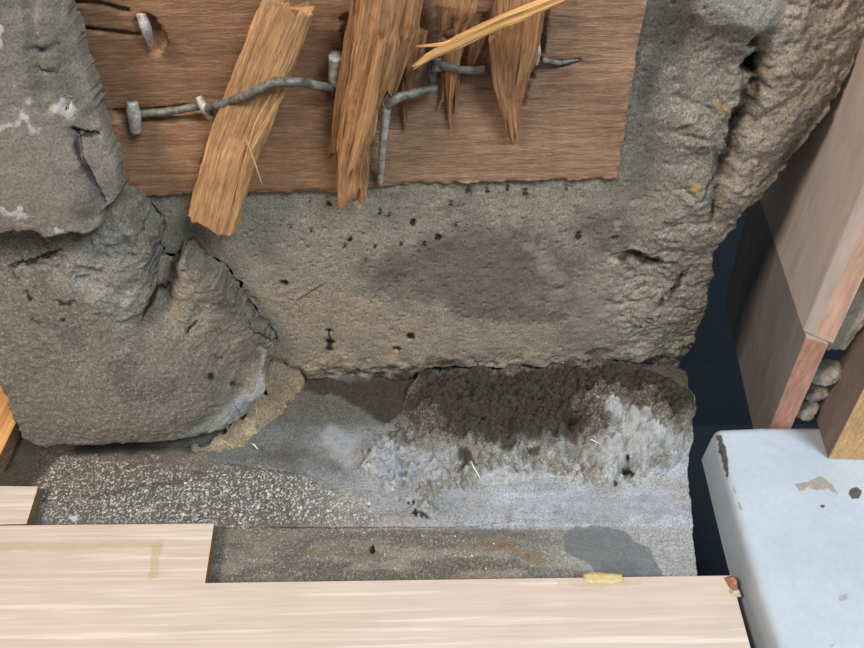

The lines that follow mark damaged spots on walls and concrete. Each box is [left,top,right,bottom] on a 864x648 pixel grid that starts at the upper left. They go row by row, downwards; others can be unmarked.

crack [732,66,762,117]
crack [73,127,96,184]
crack [13,250,58,325]
crack [143,282,170,316]
damp [304,348,695,472]
damp [363,435,445,484]
damp [474,465,536,485]